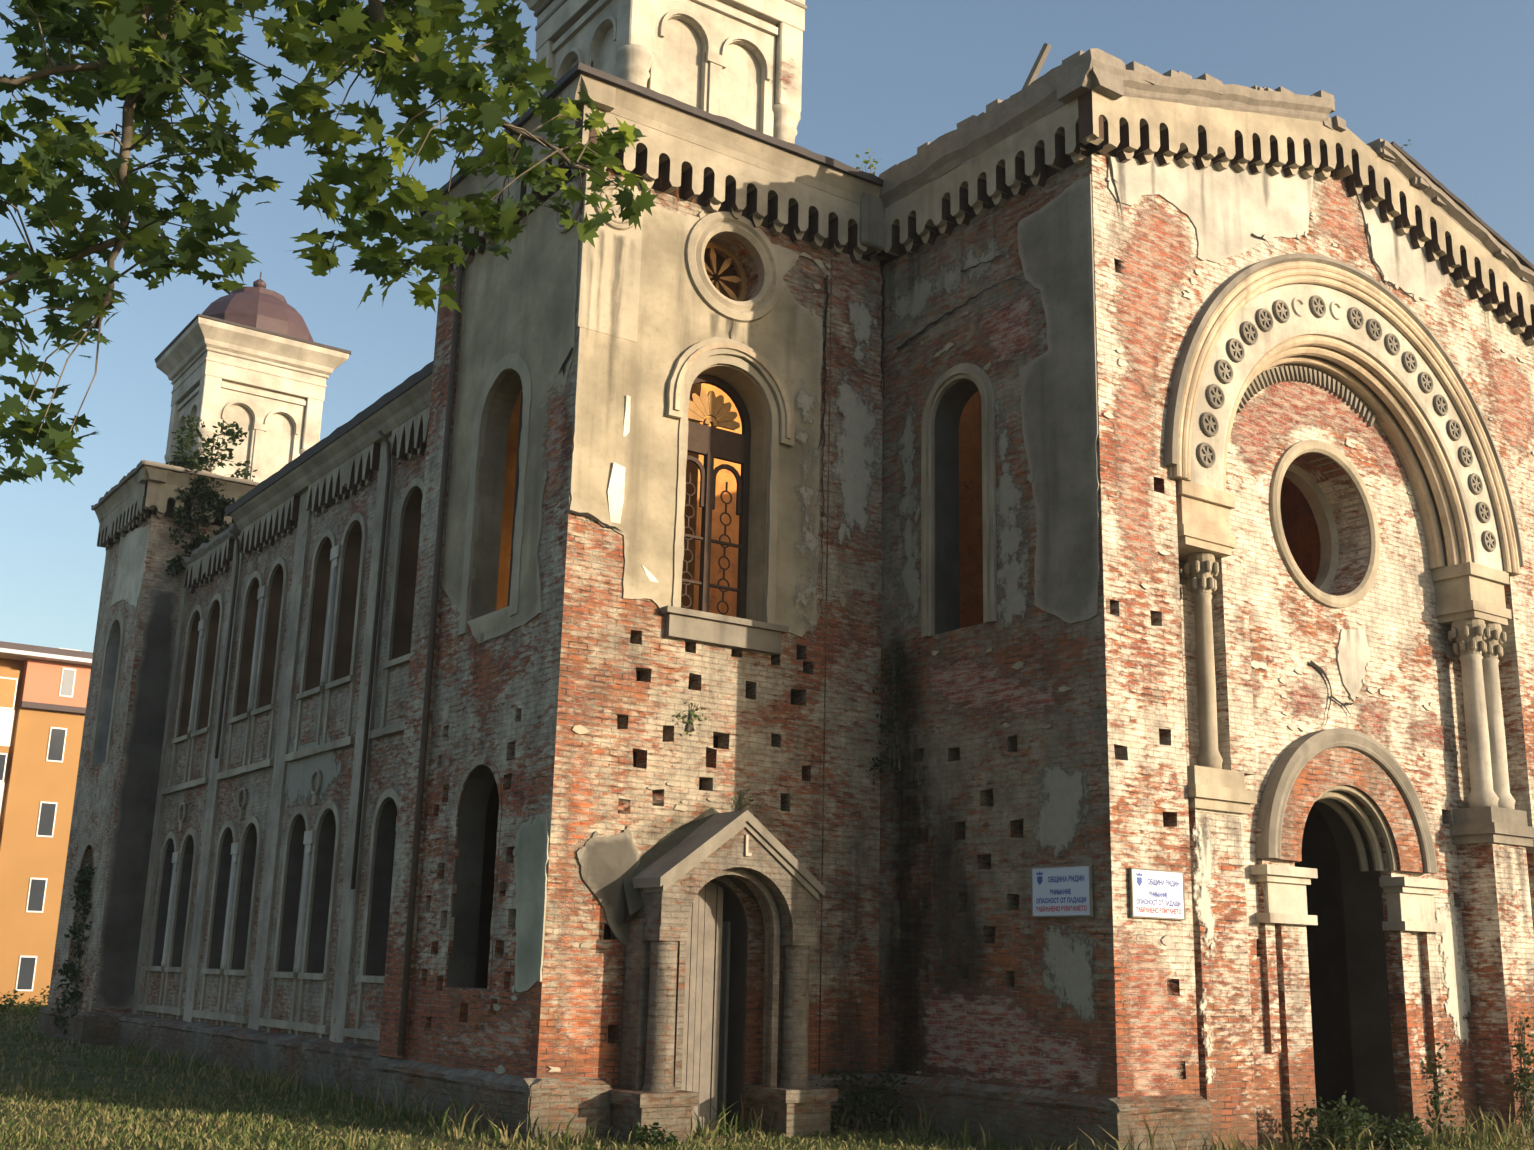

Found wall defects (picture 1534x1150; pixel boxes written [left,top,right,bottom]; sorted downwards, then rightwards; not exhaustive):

spalling [1296,173,1368,260]
flaking render [795,300,921,623]
flaking render [995,400,1035,628]
spalling [1102,203,1206,590]
spalling [1228,381,1412,495]
spalling [1487,349,1534,457]
spalling [547,725,727,1072]
spalling [916,925,1105,1093]
flaking render [1032,762,1093,859]
spalling [1119,927,1216,1096]
flaking render [1193,819,1218,958]
flaking render [1435,893,1471,1047]